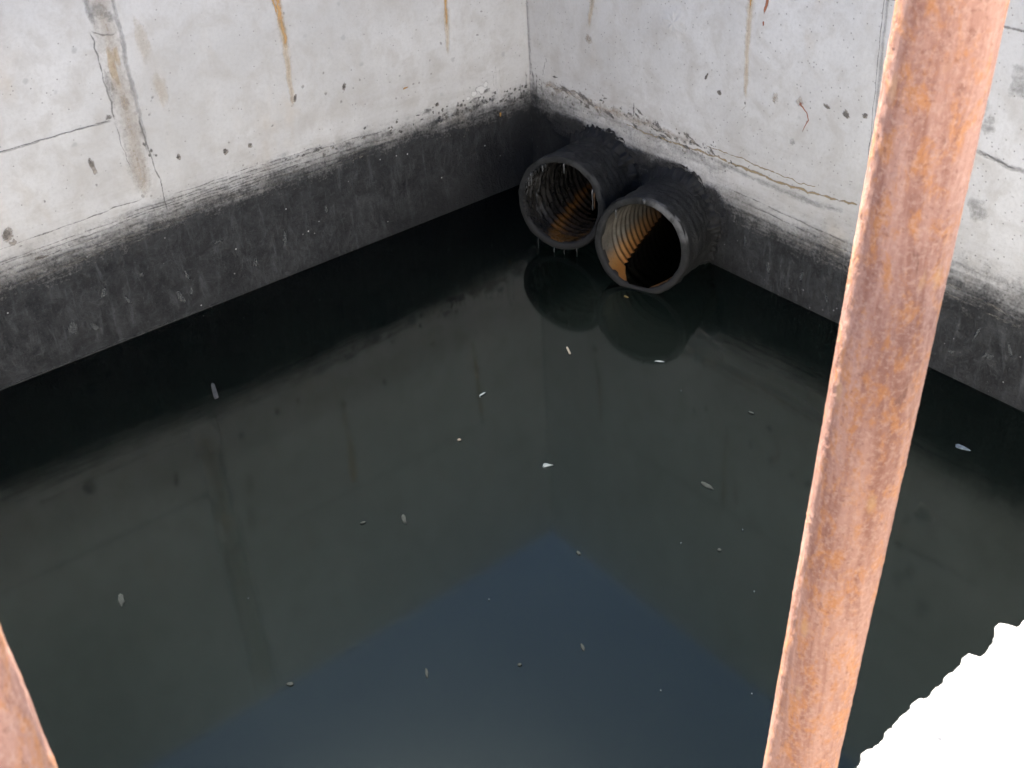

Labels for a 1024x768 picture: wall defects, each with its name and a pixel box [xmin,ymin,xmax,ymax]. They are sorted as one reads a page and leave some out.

corrosion [272,0,287,44]
crack [0,32,114,152]
crack [139,121,167,208]
damp [627,124,857,205]
damp [0,75,690,391]
damp [701,182,851,324]
damp [928,271,1024,412]